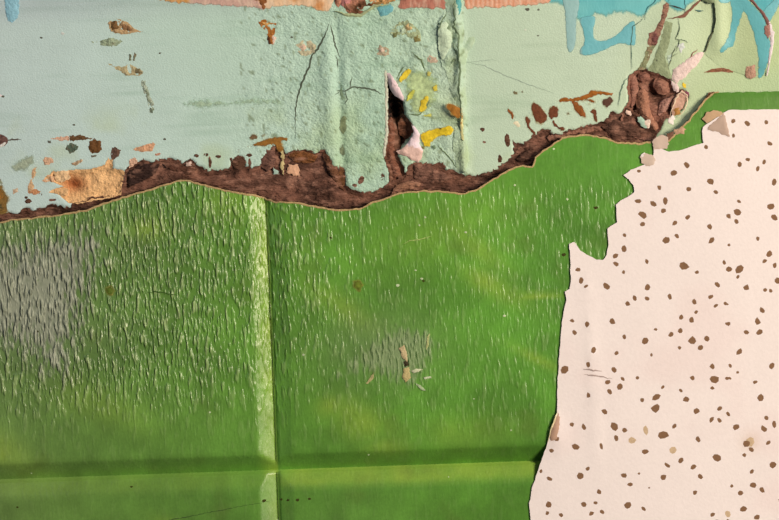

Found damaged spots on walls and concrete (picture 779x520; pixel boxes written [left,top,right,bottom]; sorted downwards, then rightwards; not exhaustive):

crack [295,24,381,138]
spalling [0,0,775,222]